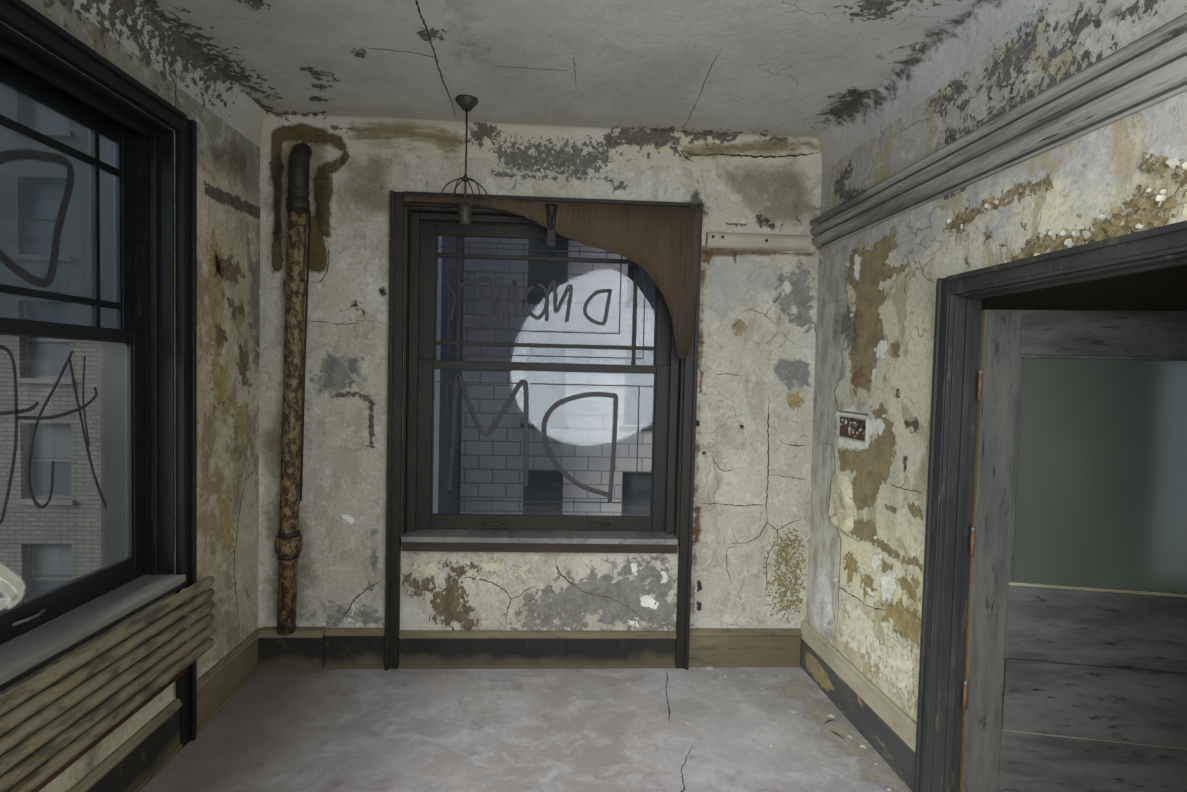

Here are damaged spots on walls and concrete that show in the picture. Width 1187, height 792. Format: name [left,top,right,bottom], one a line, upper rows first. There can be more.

peeling [44,0,368,134]
crack [364,0,456,118]
peeling [835,0,961,21]
peeling [927,0,1166,151]
peeling [464,120,800,194]
peeling [943,147,1187,263]
peeling [330,391,376,449]
crack [701,291,883,639]
peeling [773,226,923,711]
flaking render [401,553,677,631]
crack [464,554,648,624]
water stain [762,523,808,628]